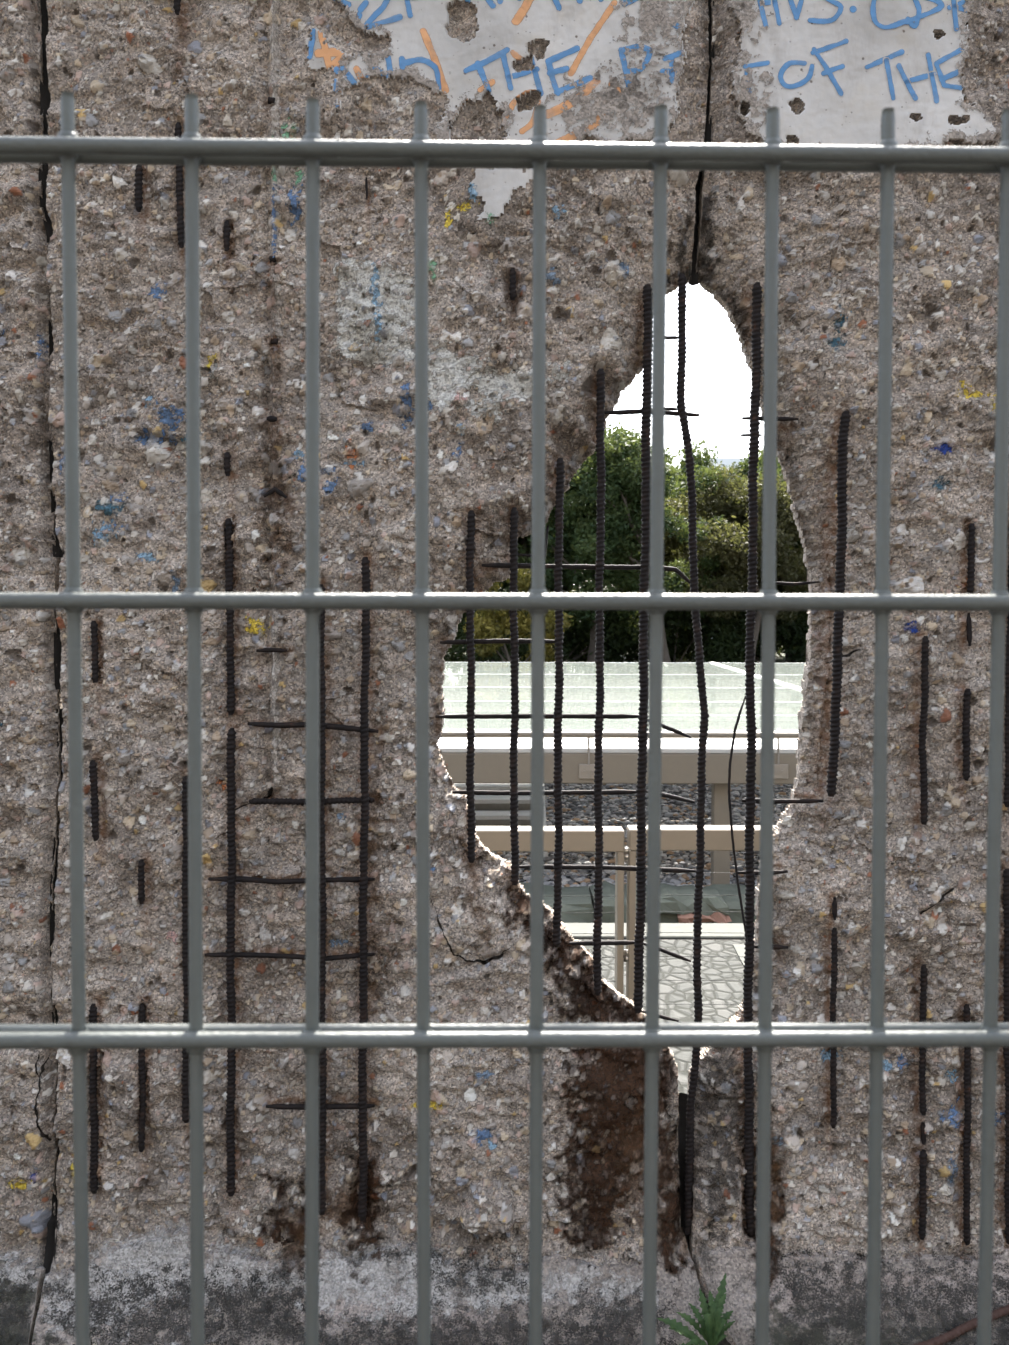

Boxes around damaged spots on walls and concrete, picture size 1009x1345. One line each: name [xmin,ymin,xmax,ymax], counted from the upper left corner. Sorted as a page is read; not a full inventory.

crack [38,0,53,243]
crack [689,0,714,286]
spalling [0,163,1009,594]
crack [50,624,64,965]
spalling [0,609,306,1024]
spalling [733,610,1009,1023]
corrosion [475,873,646,1023]
damp [0,1211,682,1345]
corrosion [326,1154,387,1282]
spalling [0,1047,1009,1275]
corrosion [547,1048,695,1290]
damp [664,1047,754,1260]